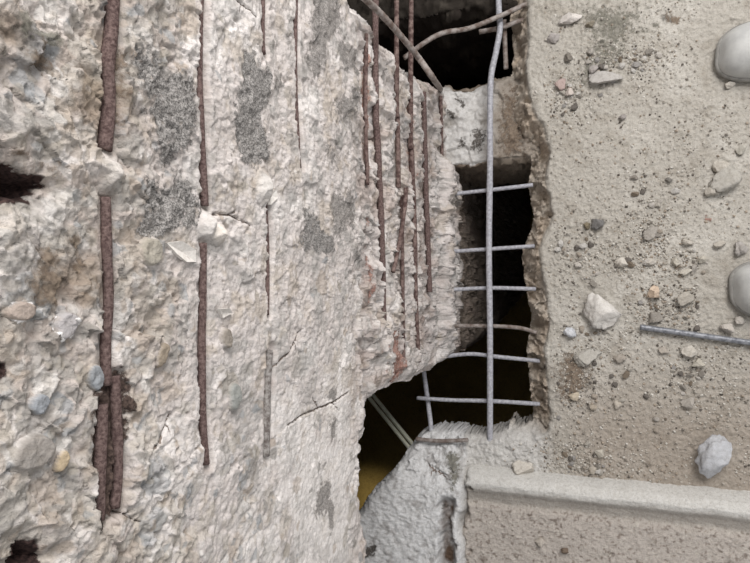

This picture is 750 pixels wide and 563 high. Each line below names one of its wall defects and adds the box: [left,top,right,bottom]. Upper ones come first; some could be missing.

spalling [0,163,45,204]
spalling [293,0,540,491]
corrosion [389,331,407,382]
corrosion [112,366,137,444]
crack [288,392,348,425]
corrosion [91,386,115,530]
spalling [313,481,335,529]